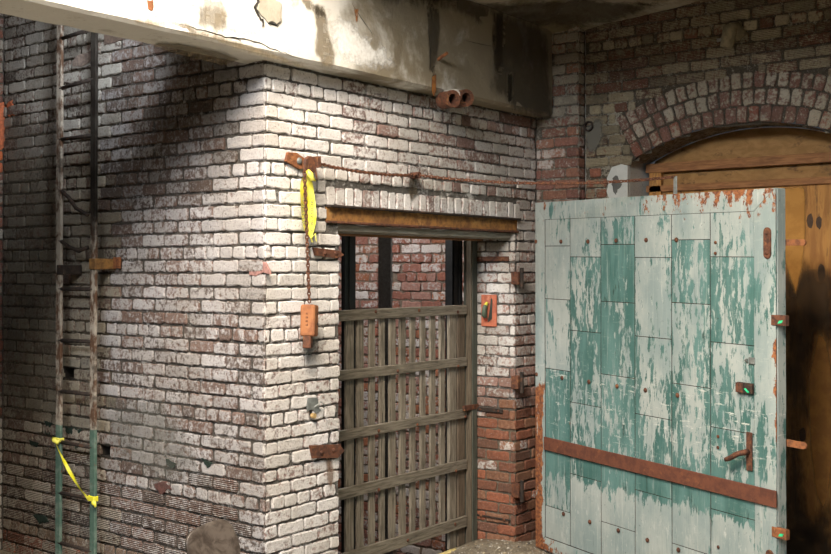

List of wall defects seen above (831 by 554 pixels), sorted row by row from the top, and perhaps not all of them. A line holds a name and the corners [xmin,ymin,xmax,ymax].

flaking render [254,0,282,26]